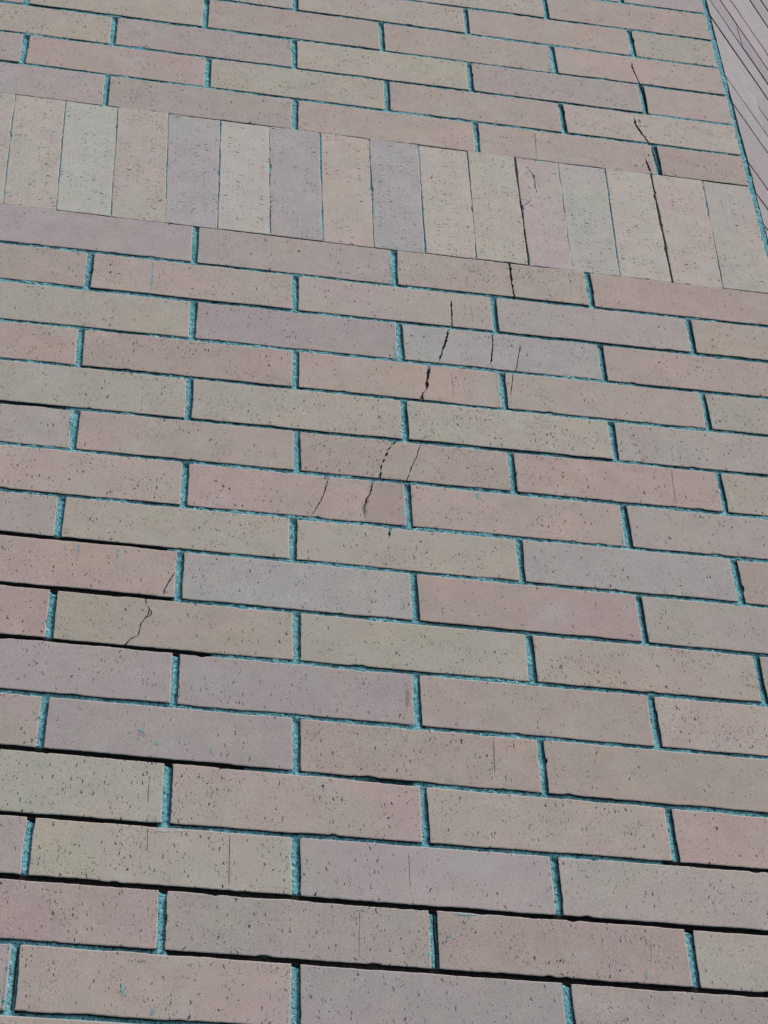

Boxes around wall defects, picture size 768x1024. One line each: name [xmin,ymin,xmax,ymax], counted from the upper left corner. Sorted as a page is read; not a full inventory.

crack [631,65,673,283]
crack [420,303,520,401]
crack [364,442,420,507]
crack [124,572,175,647]